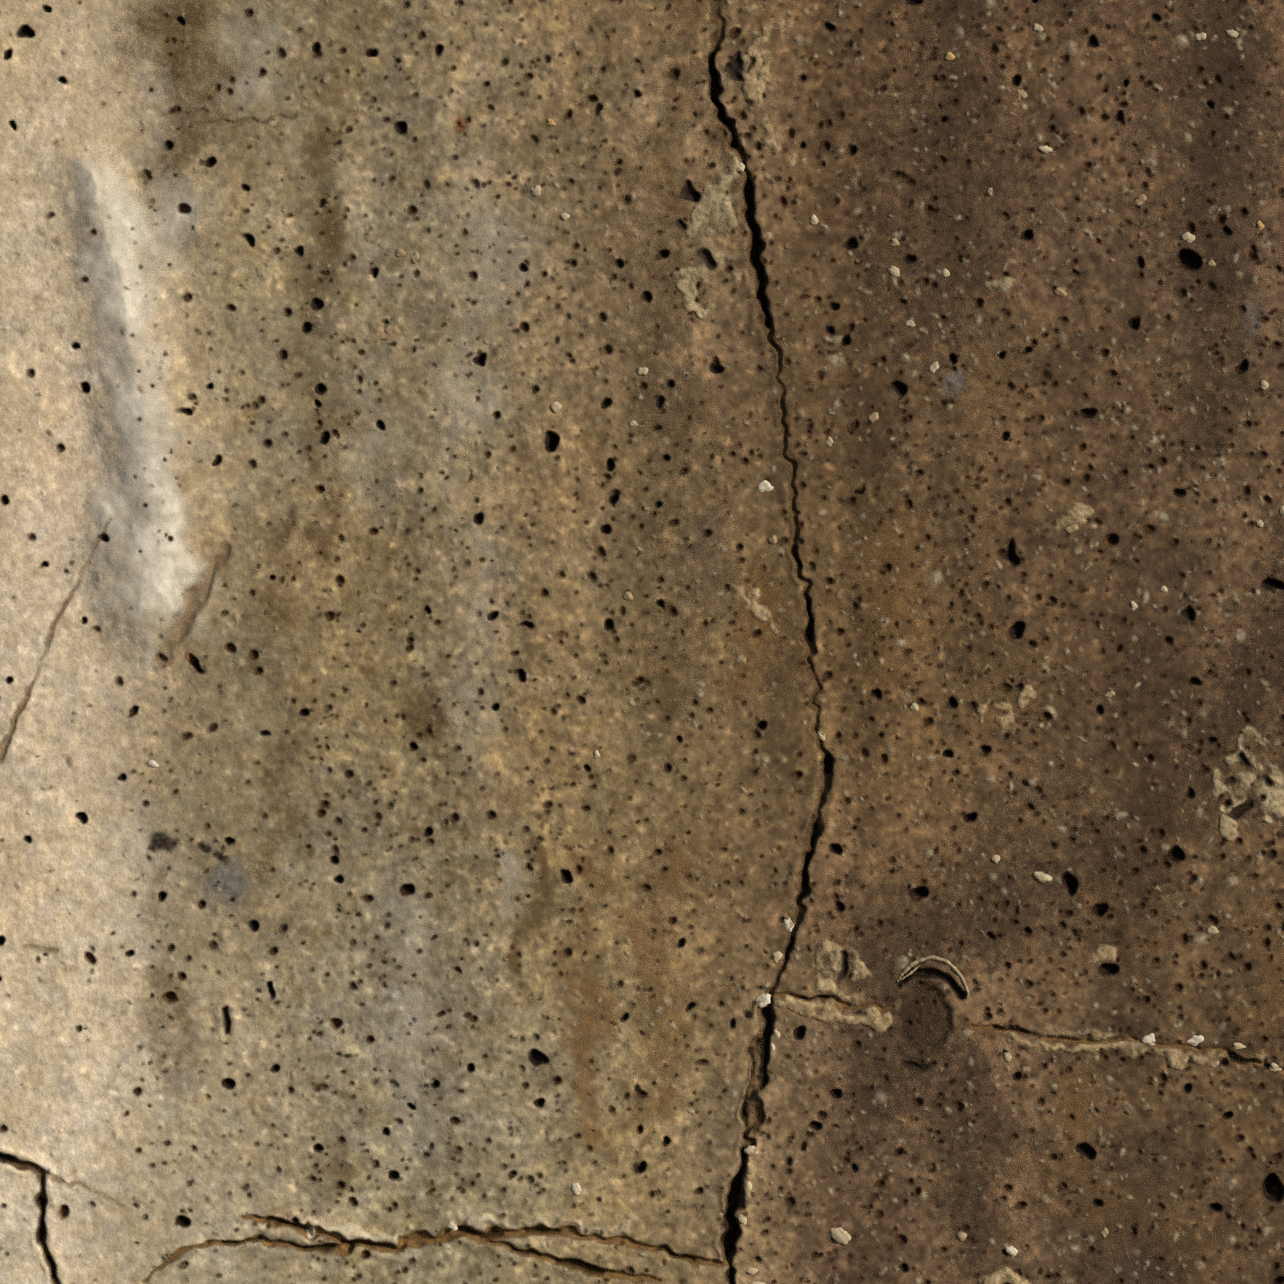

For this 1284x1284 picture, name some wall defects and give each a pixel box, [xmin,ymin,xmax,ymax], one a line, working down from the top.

crack [0,1153,79,1284]
crack [143,0,893,1284]
leakage [798,0,1284,1284]
crack [969,1024,1284,1074]